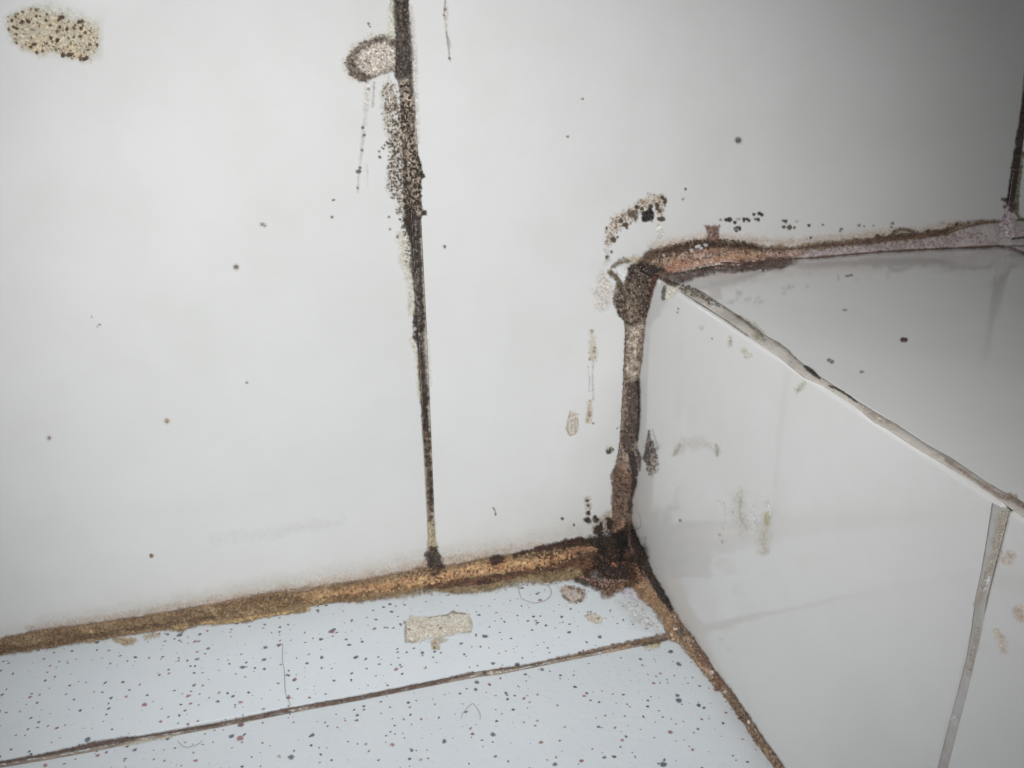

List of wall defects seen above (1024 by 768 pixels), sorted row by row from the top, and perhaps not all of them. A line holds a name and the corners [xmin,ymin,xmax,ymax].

mould [7,8,98,61]
leakage [344,0,445,571]
mould [597,196,718,326]
mould [720,212,763,232]
leakage [999,93,1024,239]